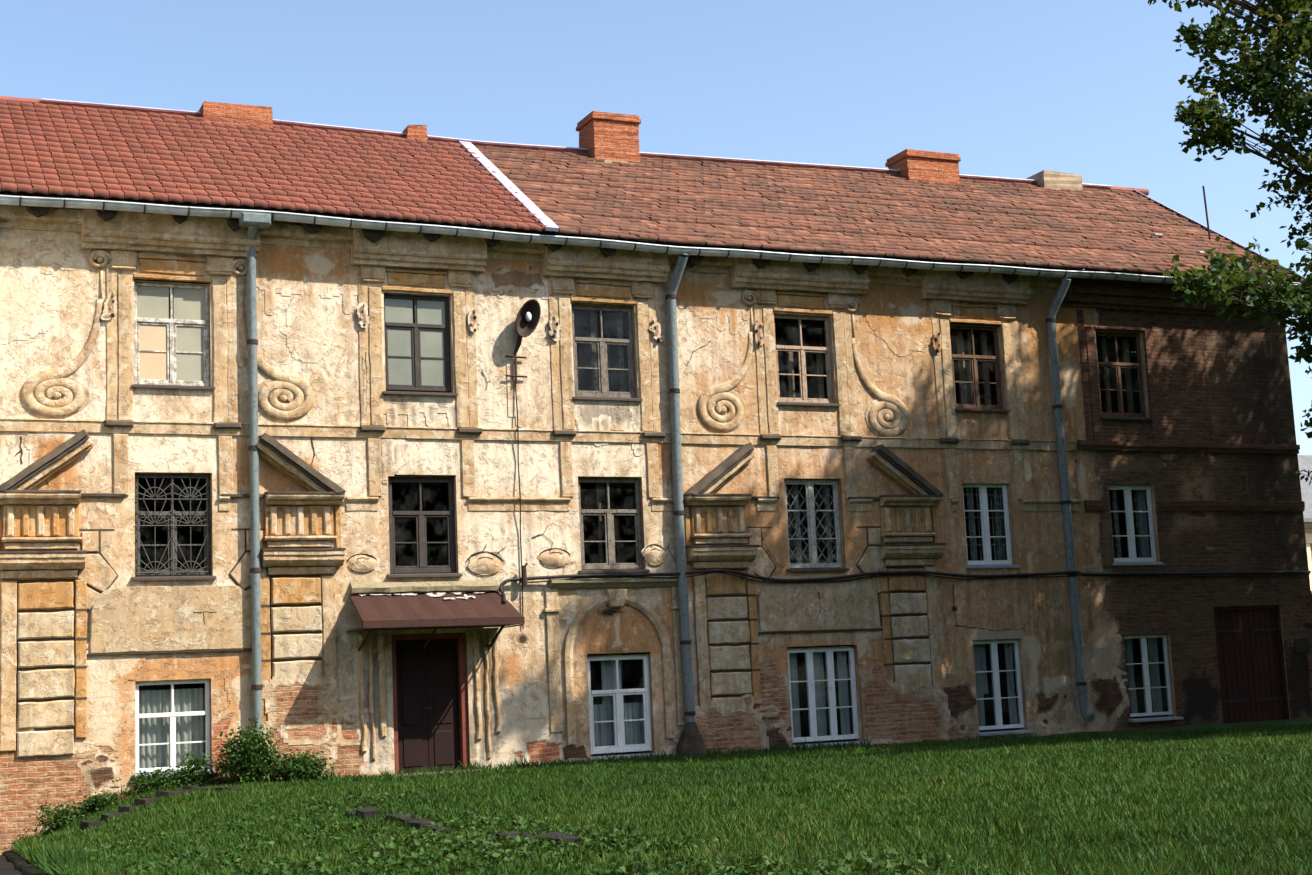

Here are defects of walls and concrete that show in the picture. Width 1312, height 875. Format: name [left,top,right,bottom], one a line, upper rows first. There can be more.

spalling [966,308,1232,731]
spalling [0,641,145,875]
spalling [203,661,393,786]
spalling [682,694,793,754]
spalling [854,631,982,743]